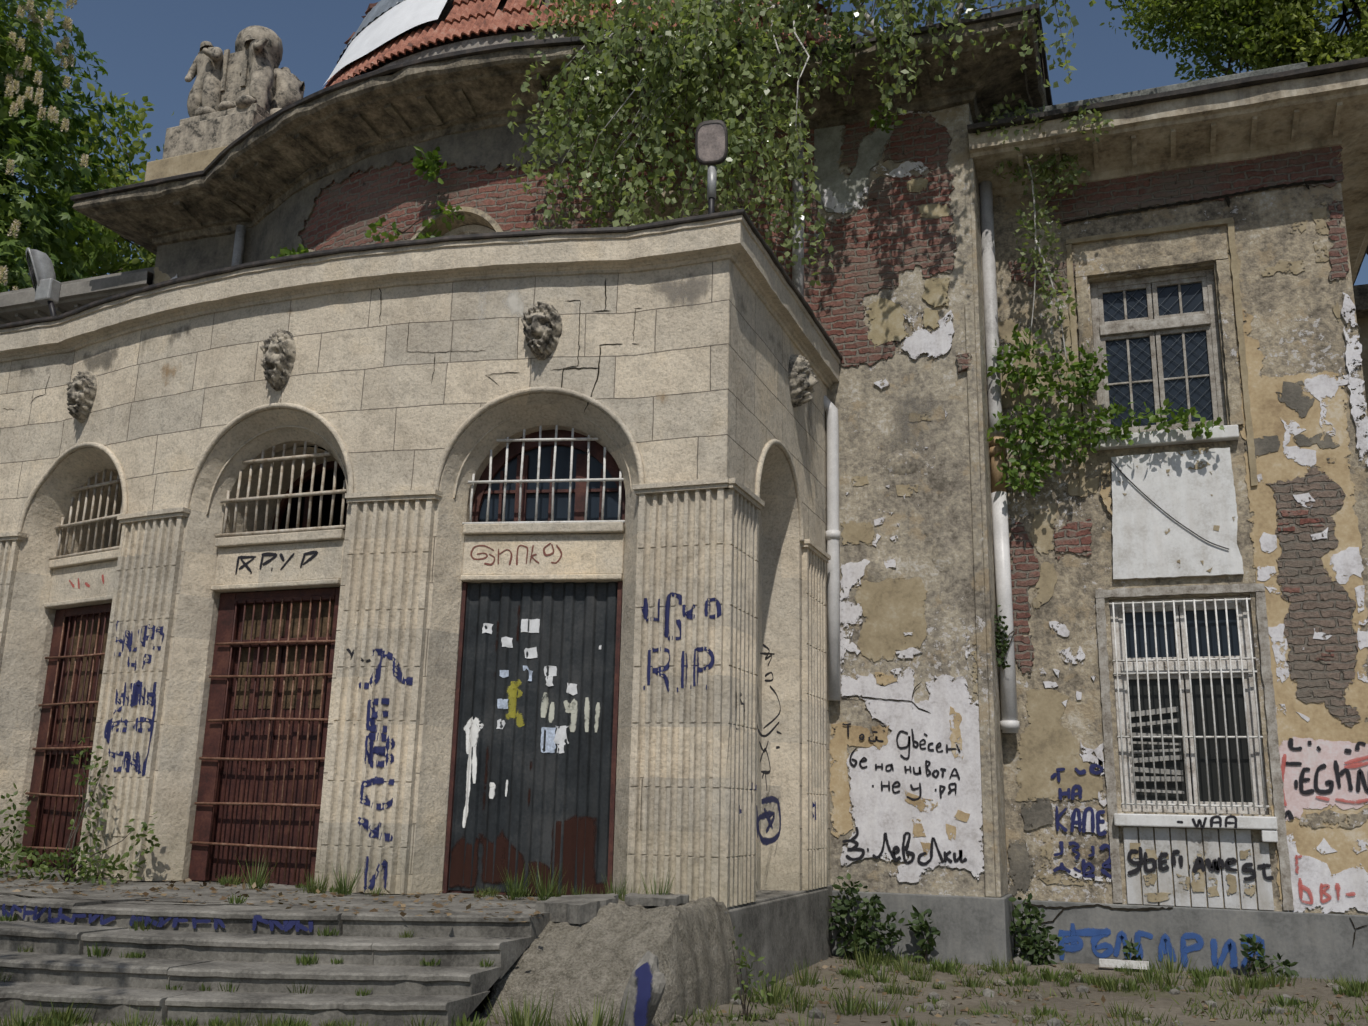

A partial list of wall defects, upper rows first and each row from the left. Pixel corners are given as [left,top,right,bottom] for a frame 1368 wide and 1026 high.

crack [379,288,519,384]
crack [553,279,639,412]
spalling [814,111,973,390]
peeling [829,509,984,883]
peeling [1007,509,1112,897]
spalling [1045,145,1368,914]